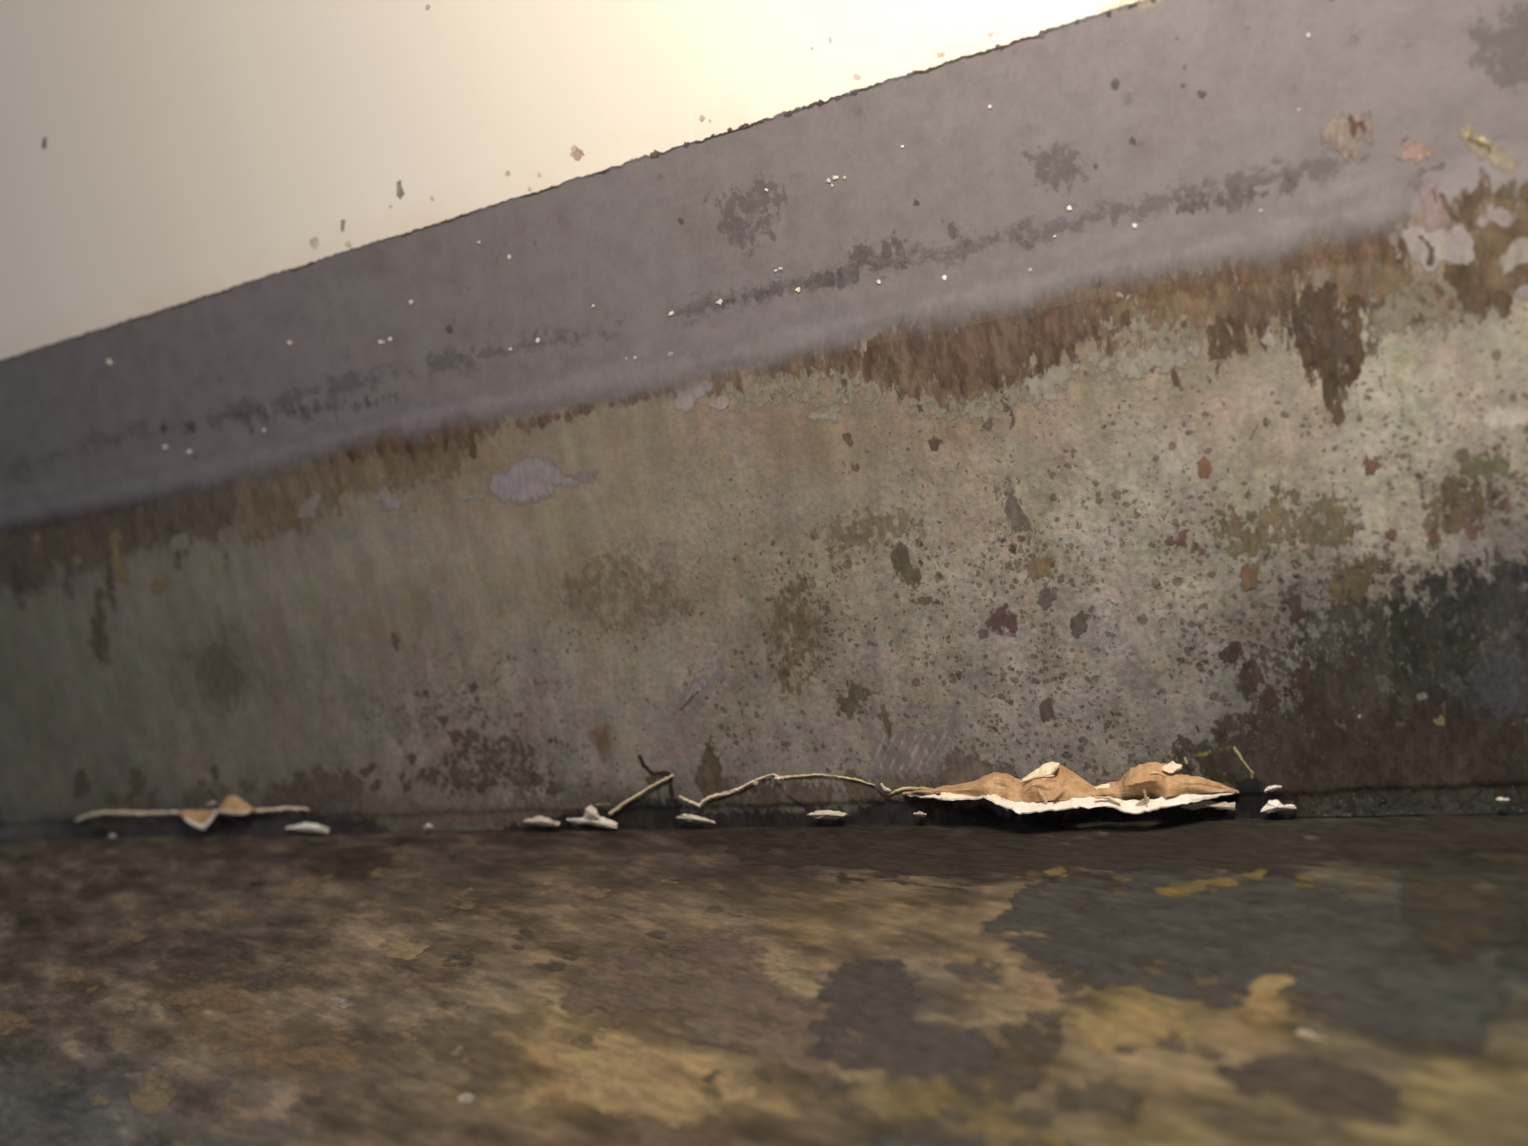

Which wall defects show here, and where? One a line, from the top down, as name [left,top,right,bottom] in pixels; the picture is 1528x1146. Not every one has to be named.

peeling [1460,124,1523,173]
peeling [1369,136,1528,344]
corrosion [707,167,1528,430]
corrosion [842,433,859,471]
corrosion [929,435,943,451]
water stain [1172,547,1528,815]
peeling [75,795,329,833]
peeling [567,774,673,828]
peeling [677,761,1239,823]